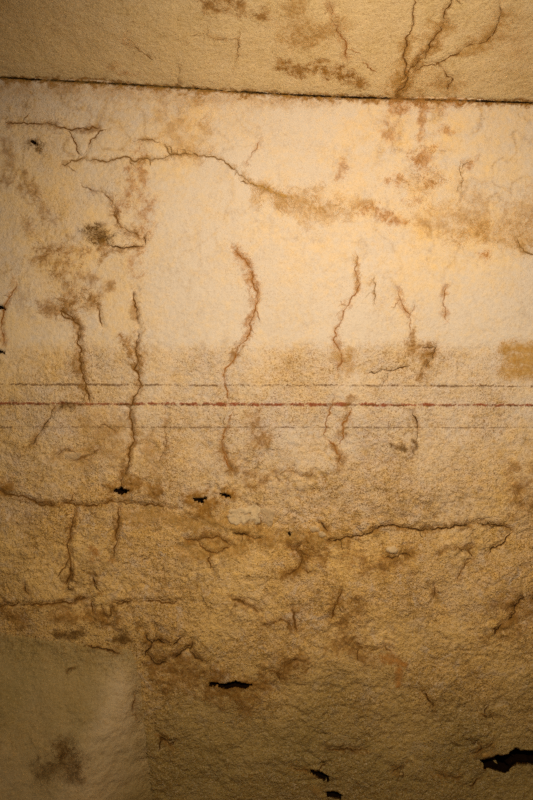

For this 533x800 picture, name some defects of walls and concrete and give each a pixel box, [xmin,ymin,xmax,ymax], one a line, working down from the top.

crack [0,0,533,108]
crack [6,115,281,248]
crack [222,247,260,470]
crack [333,265,376,369]
water stain [498,340,533,380]
crack [0,293,179,616]
crack [323,405,352,465]
crack [319,522,511,578]